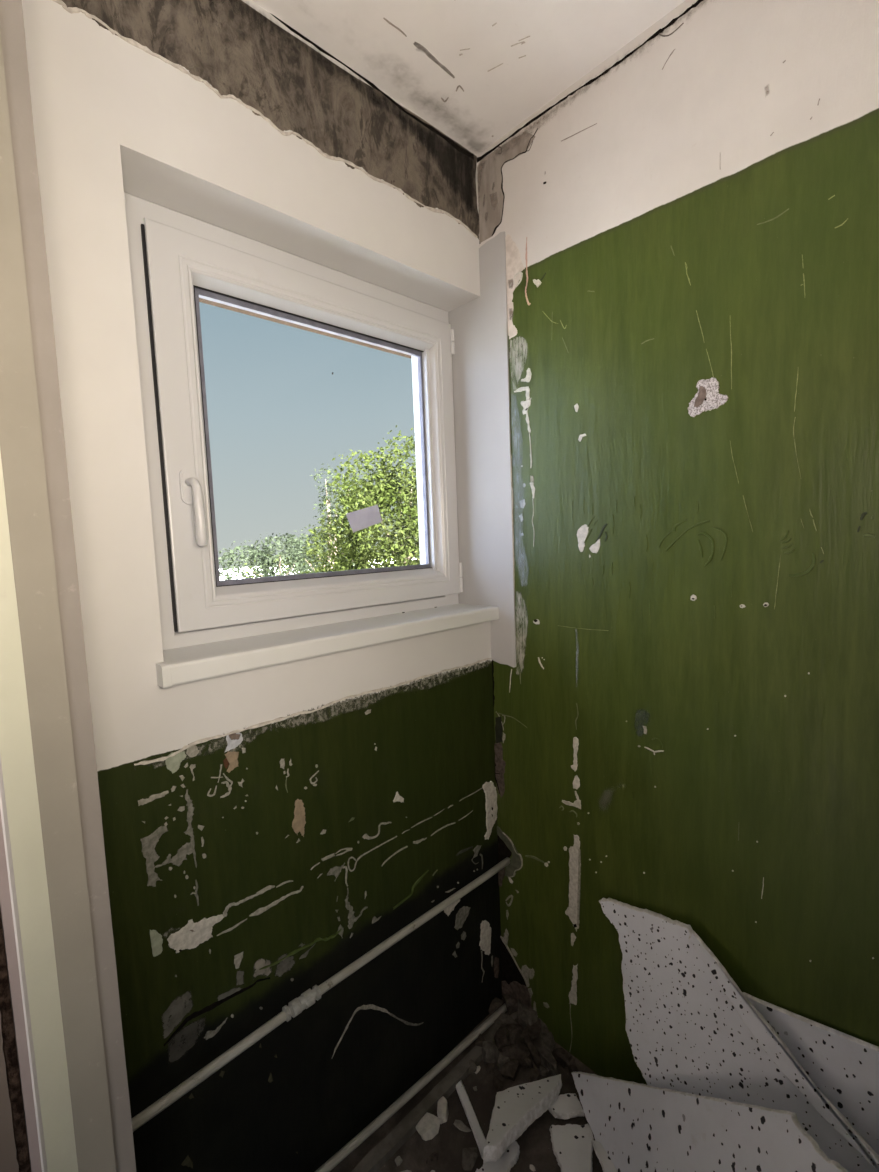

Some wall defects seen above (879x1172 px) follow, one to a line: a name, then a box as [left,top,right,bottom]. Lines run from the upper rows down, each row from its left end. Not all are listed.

crack [270,0,704,244]
peeling [505,234,546,693]
flaking render [688,377,728,417]
flaking render [161,991,234,1064]
flaking render [217,943,316,1001]
peeling [134,658,492,958]
spalling [456,716,550,1017]
peeling [559,703,581,946]
peeling [569,964,578,1052]